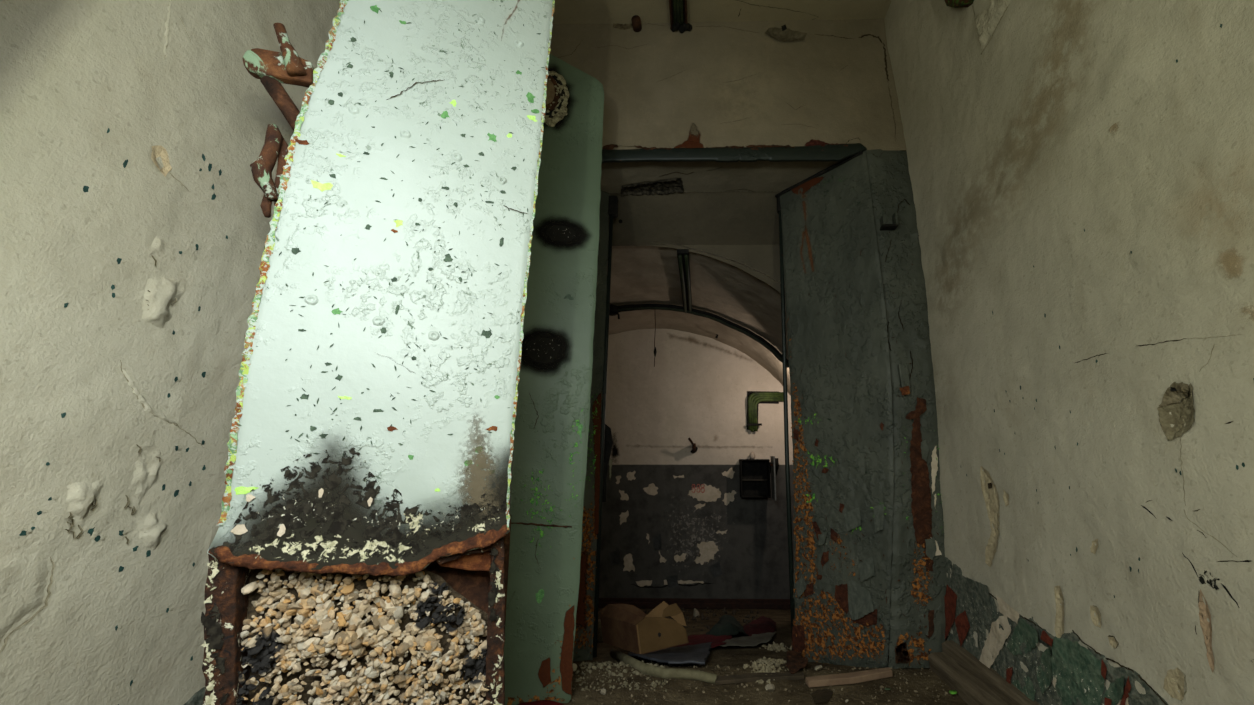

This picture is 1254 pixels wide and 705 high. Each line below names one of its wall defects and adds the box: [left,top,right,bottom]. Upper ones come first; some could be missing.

rust [216,0,349,526]
peeling [354,338,441,460]
flaking render [1157,382,1195,441]
peeling [230,524,248,535]
peeling [234,486,258,502]
rust [507,393,602,705]
peeling [616,471,658,525]
peeling [609,530,727,588]
peeling [673,468,736,510]
rust [791,383,942,666]
peeling [944,557,1187,705]